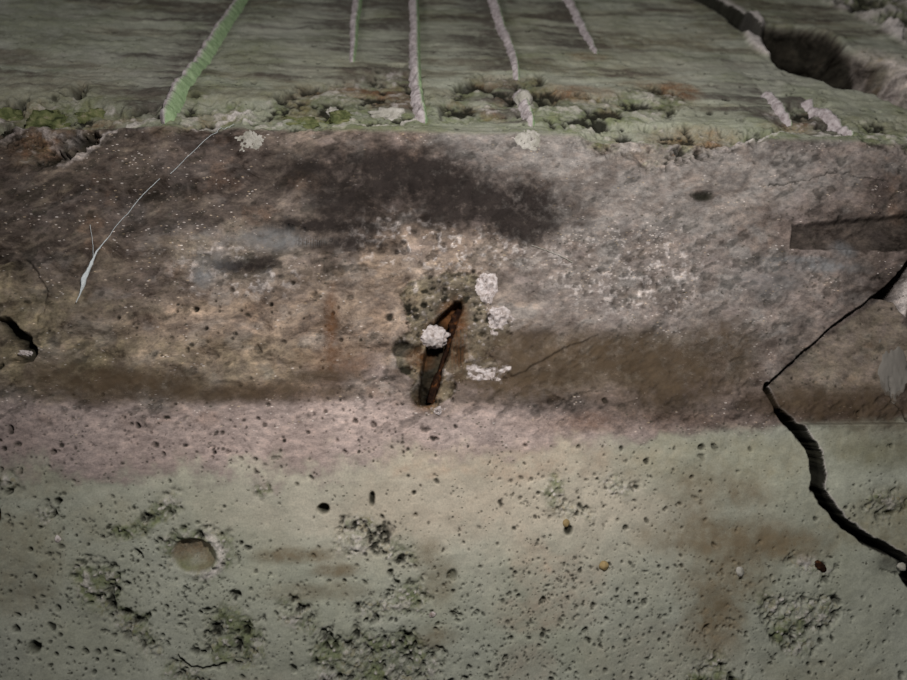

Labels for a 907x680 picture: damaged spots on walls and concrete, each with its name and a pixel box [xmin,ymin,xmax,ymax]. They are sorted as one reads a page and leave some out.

crack [696,0,907,109]
peeling [0,259,49,370]
spalling [394,269,514,411]
damp [461,273,716,404]
crack [763,261,907,585]